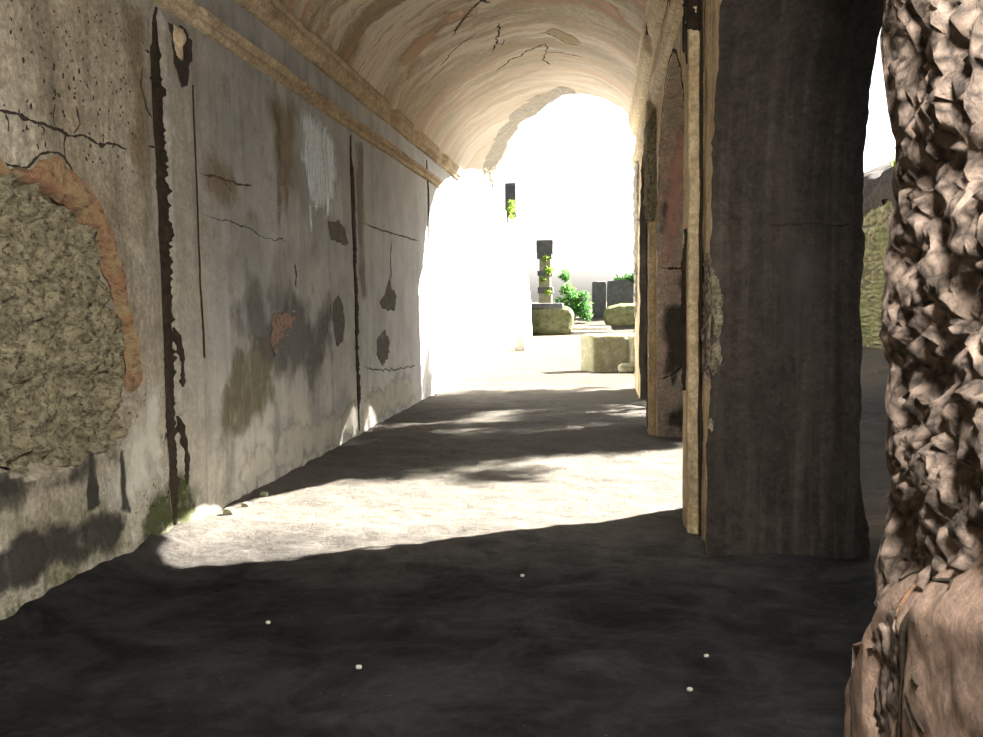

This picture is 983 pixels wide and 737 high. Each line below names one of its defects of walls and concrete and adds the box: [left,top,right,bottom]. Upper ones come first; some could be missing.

crack [440,0,580,69]
spalling [22,7,144,172]
crack [140,49,152,118]
crack [0,104,156,171]
spalling [0,141,146,474]
water stain [238,281,333,386]
water stain [664,304,682,385]
spalling [700,248,724,382]
water stain [669,407,683,429]